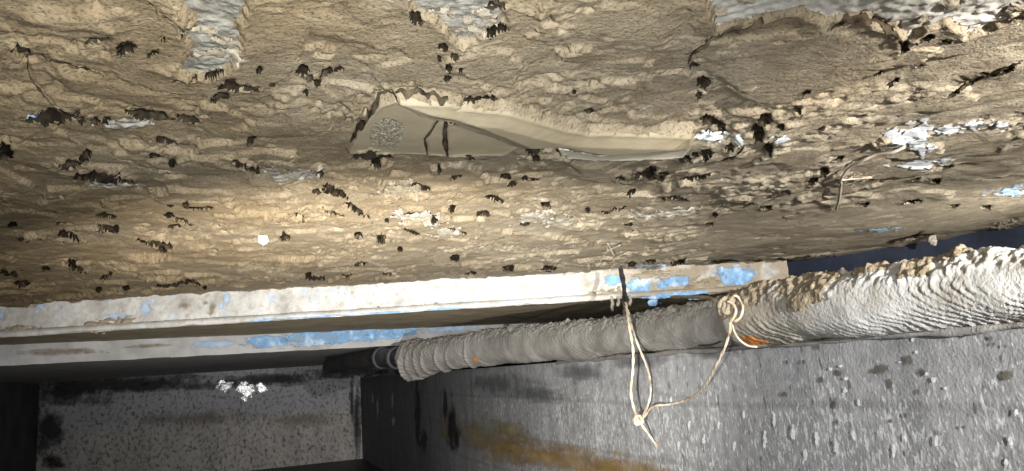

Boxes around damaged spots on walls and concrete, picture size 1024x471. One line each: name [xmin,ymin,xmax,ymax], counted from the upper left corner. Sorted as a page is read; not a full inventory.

spalling [172,0,275,104]
spalling [407,0,510,83]
spalling [710,0,1024,55]
crack [950,62,1021,98]
peeling [597,258,757,306]
peeling [194,325,480,349]
damp [443,391,523,449]